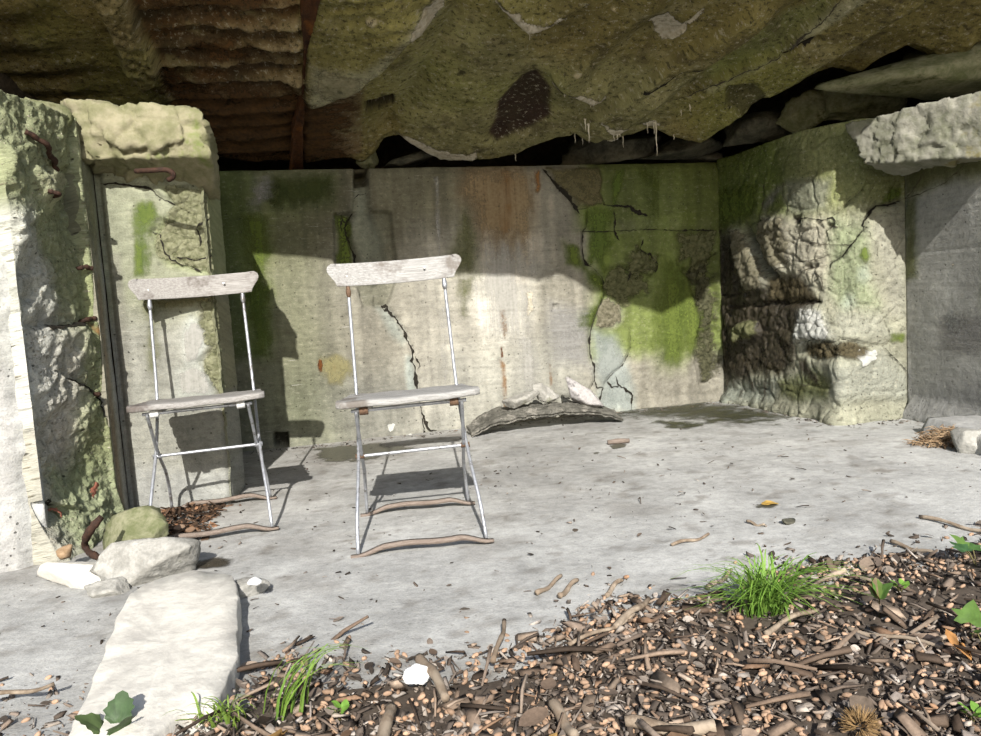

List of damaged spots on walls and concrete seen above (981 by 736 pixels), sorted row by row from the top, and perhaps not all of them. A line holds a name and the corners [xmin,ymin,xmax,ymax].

efflorescence [551,80,606,108]
leakage [398,133,477,161]
efflorescence [574,119,629,148]
leakage [643,120,660,146]
crack [153,214,212,271]
crack [721,163,966,308]
crack [543,169,714,409]
leakage [719,231,828,401]
crack [381,304,436,433]
leakage [599,340,629,407]